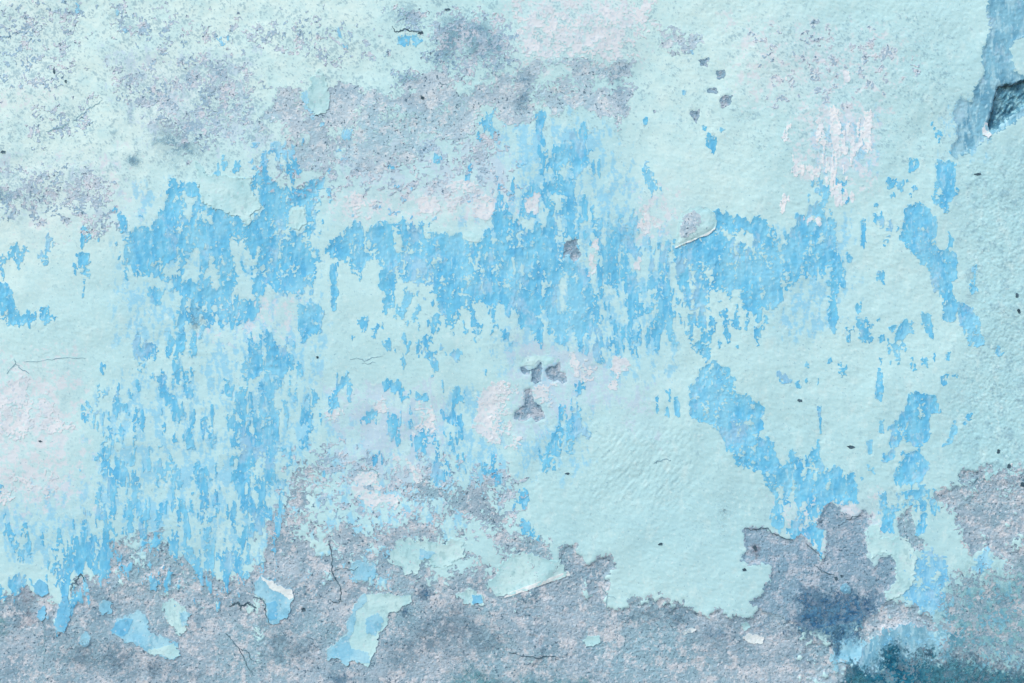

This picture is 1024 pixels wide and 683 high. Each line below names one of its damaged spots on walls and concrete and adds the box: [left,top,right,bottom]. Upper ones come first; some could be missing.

peeling [241,11,353,68]
peeling [0,0,98,150]
peeling [104,11,256,153]
spalling [707,69,733,108]
peeling [689,109,725,155]
peeling [860,0,1024,348]
peeling [845,301,936,402]
peeling [360,378,411,447]
peeling [440,386,466,452]
peeling [471,362,567,450]
crack [328,541,358,603]
crack [229,597,269,623]